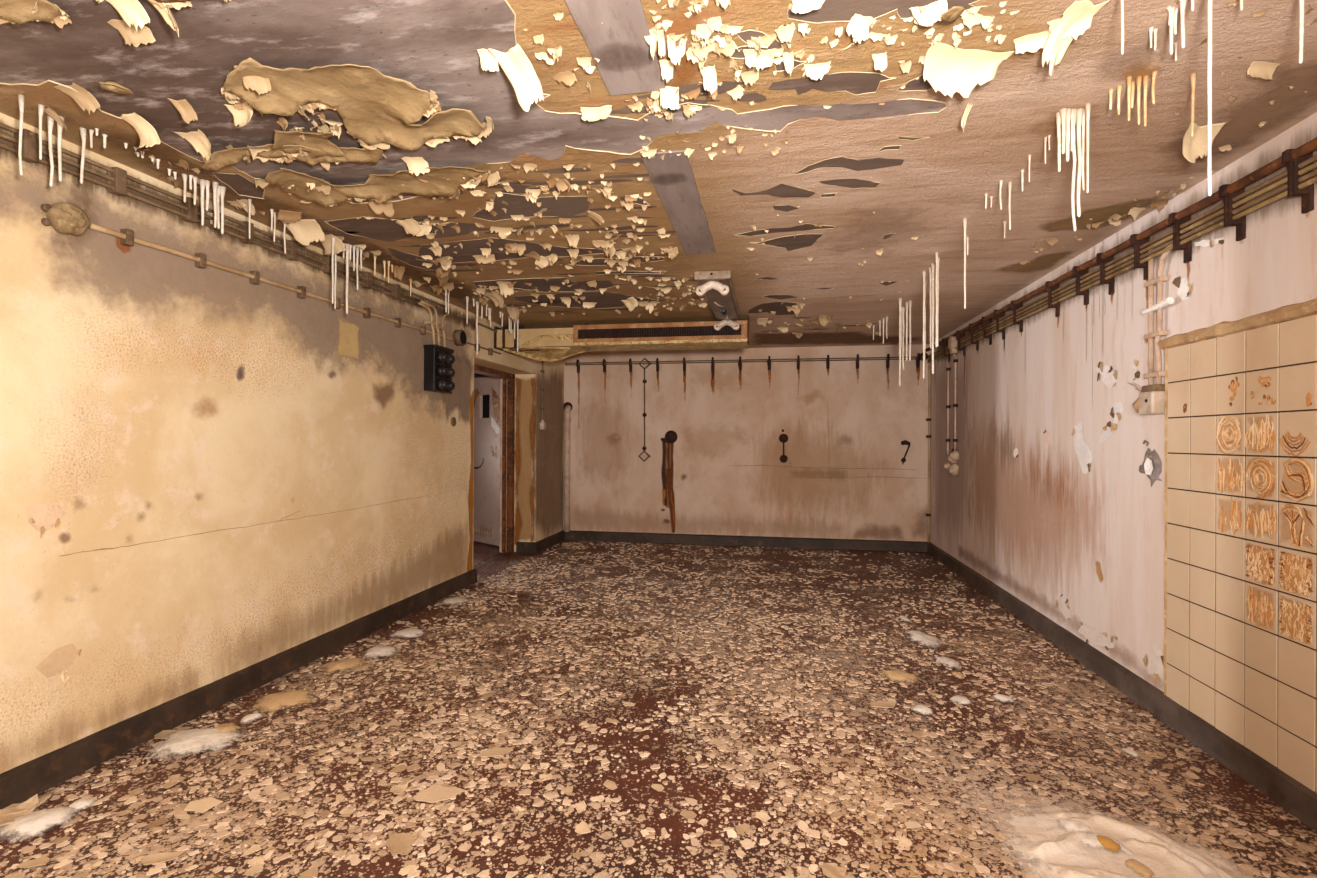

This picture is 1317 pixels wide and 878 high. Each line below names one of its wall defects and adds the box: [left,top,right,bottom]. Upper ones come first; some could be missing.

damp [1199,66,1317,157]
peeling [0,0,1020,318]
damp [1045,199,1154,231]
damp [0,165,471,421]
peeling [746,274,879,338]
spalling [1072,360,1140,474]
crack [61,494,434,556]
corrosion [661,441,675,533]
spalling [1139,440,1162,487]
spalling [1055,594,1117,650]
damp [153,690,314,757]
damp [996,801,1253,878]